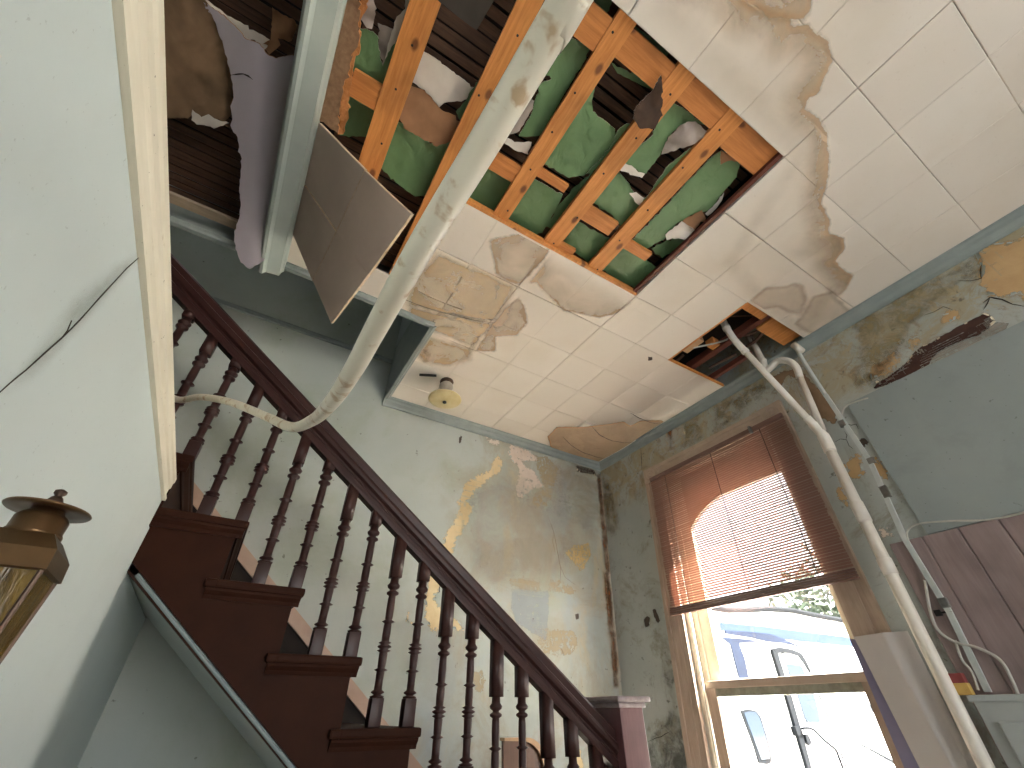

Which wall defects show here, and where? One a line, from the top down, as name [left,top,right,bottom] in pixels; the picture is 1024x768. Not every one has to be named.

leakage [733,0,852,284]
peeling [975,234,1024,301]
crack [0,258,139,393]
spalling [869,309,1008,389]
peeling [443,437,545,553]
peeling [844,438,889,480]
peeling [406,576,441,632]
peeling [537,614,579,656]